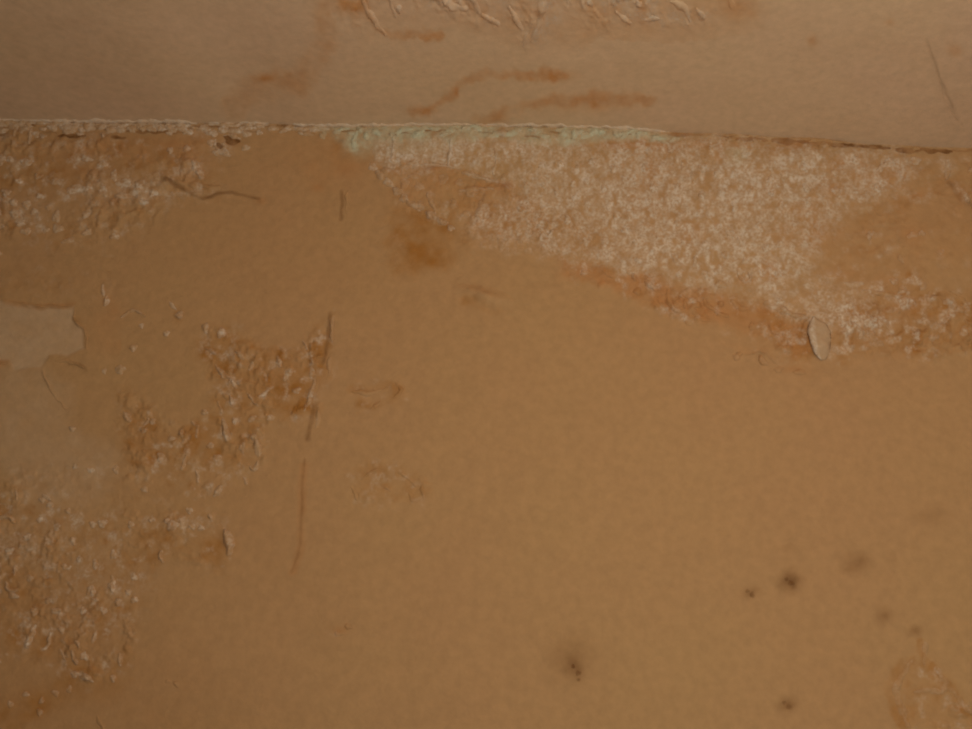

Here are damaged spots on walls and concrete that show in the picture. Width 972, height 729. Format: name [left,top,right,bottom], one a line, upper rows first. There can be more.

spalling [184,124,267,166]
peeling [789,295,850,385]